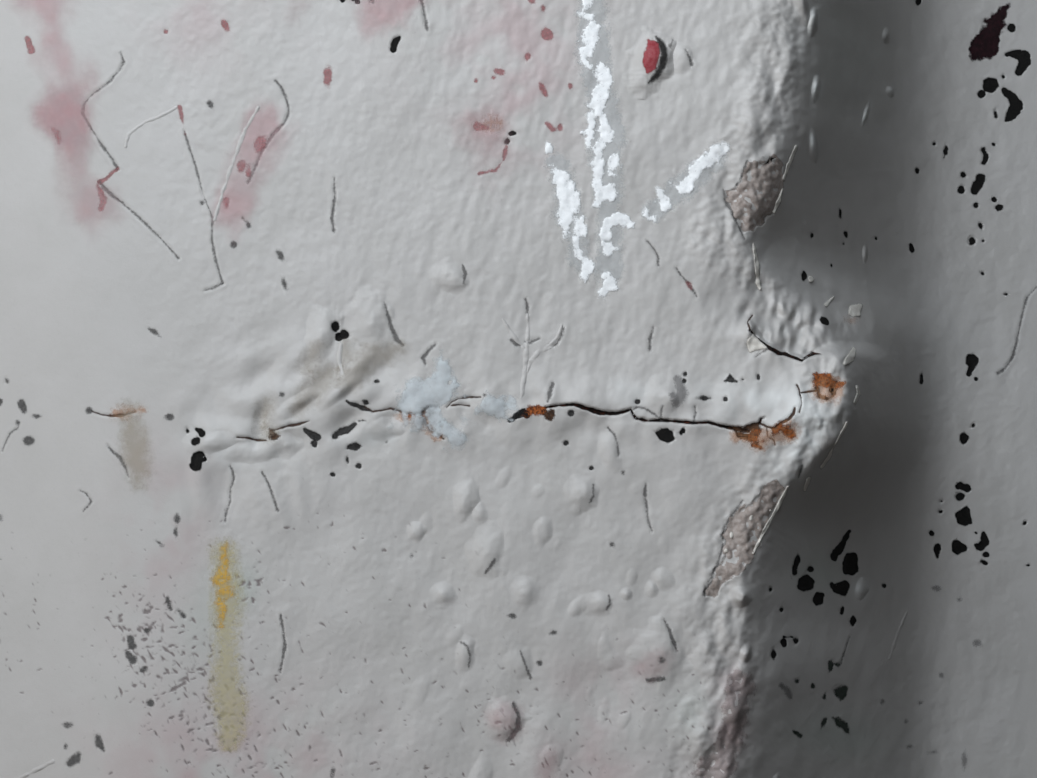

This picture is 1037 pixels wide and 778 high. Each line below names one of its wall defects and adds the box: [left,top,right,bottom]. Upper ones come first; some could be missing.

spalling [724,145,798,290]
crack [364,396,481,439]
rust [508,405,556,423]
crack [545,315,820,445]
rust [733,421,796,449]
rust [813,372,846,400]
spalling [704,480,789,597]
peeling [792,530,859,626]